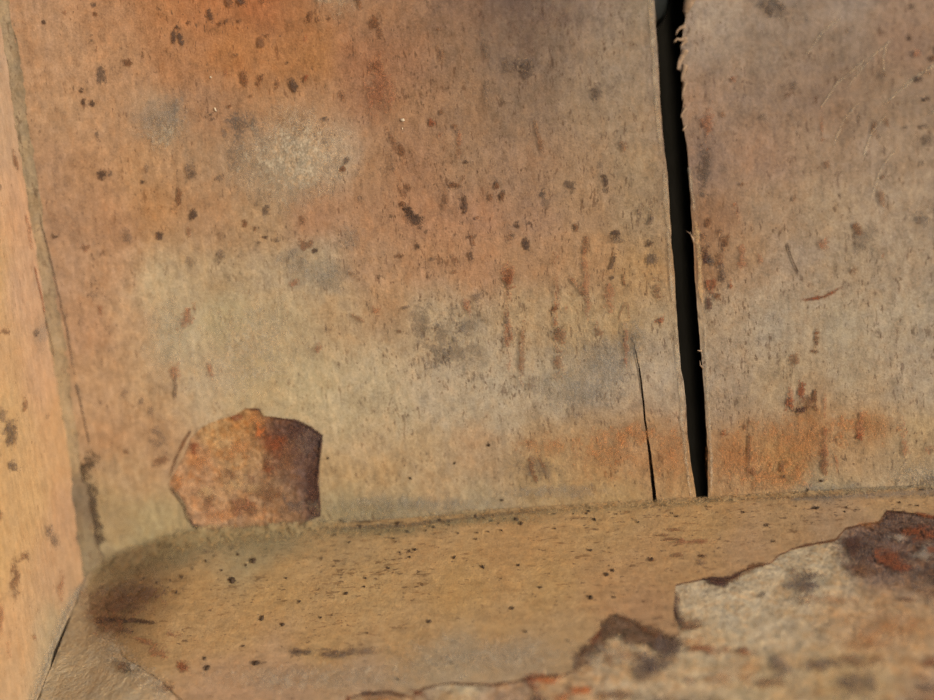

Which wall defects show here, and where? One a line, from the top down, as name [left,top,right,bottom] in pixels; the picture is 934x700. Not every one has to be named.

spalling [3,399,28,448]
spalling [153,408,322,531]
corrosion [219,423,321,519]
crack [619,275,657,502]
spalling [10,553,29,596]
peeling [38,571,180,700]
peeling [350,513,934,700]
corrosion [573,592,711,684]
corrosion [704,563,765,588]
corrosion [799,508,934,605]
corrosion [362,685,437,698]
corrosion [520,673,642,700]